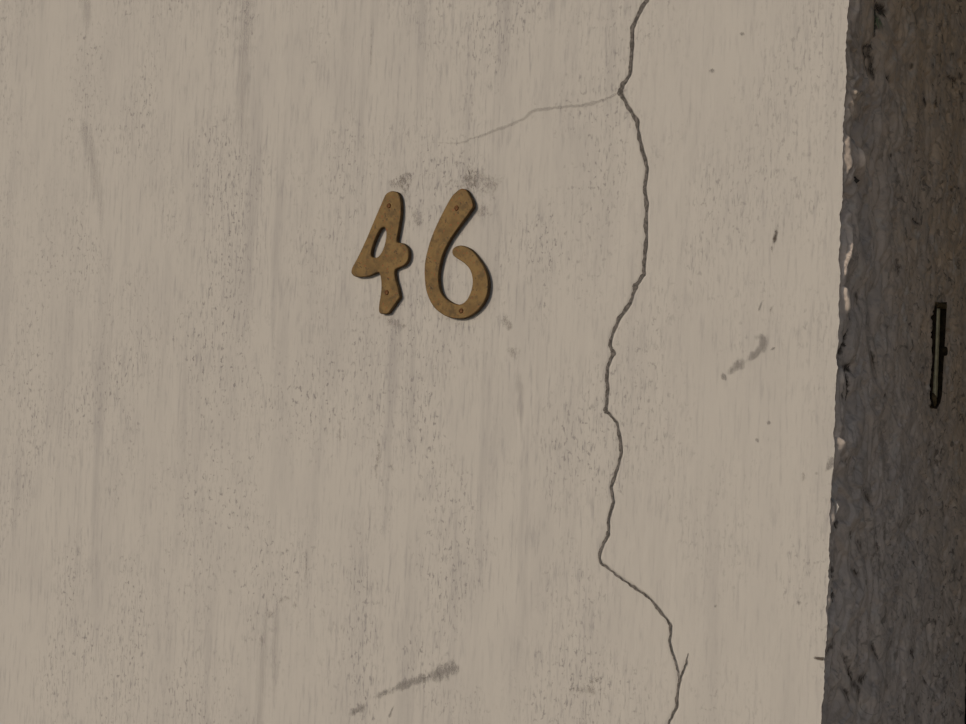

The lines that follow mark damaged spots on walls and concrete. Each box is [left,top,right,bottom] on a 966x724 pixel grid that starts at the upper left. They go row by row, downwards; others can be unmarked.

crack [598,0,688,724]